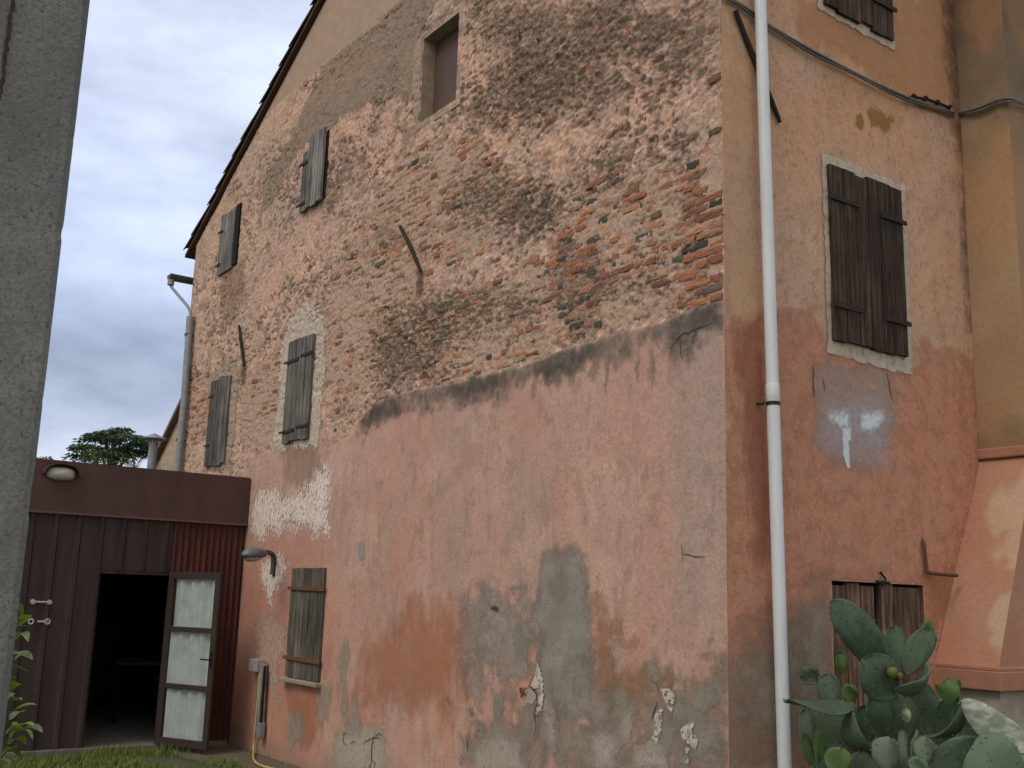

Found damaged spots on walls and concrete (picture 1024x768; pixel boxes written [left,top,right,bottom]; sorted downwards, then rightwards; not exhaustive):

damp [361,331,631,430]
flaking render [249,0,979,768]
damp [644,301,721,351]
crack [670,322,714,359]
damp [459,627,777,768]
damp [787,593,833,750]